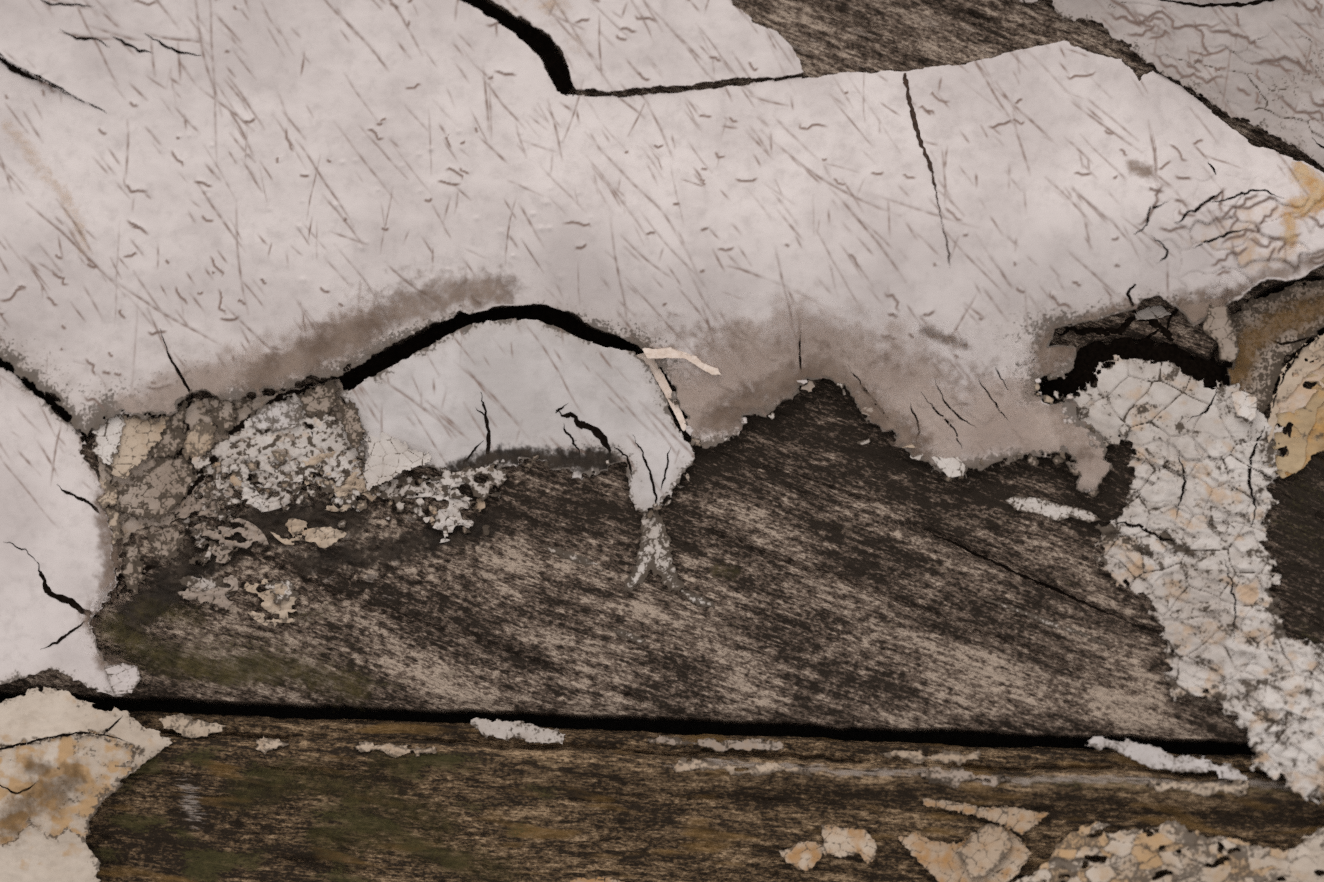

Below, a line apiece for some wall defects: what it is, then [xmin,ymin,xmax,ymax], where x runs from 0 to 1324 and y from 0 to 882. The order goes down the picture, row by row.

crack [0,53,106,113]
crack [460,0,572,96]
peeling [1019,0,1324,168]
crack [1161,0,1274,8]
crack [903,73,951,264]
crack [154,305,642,518]
spalling [91,318,721,627]
crack [847,163,1286,542]
peeling [1005,334,1324,804]
peeling [471,717,566,745]
peeling [779,824,877,872]
peeling [879,749,1324,882]